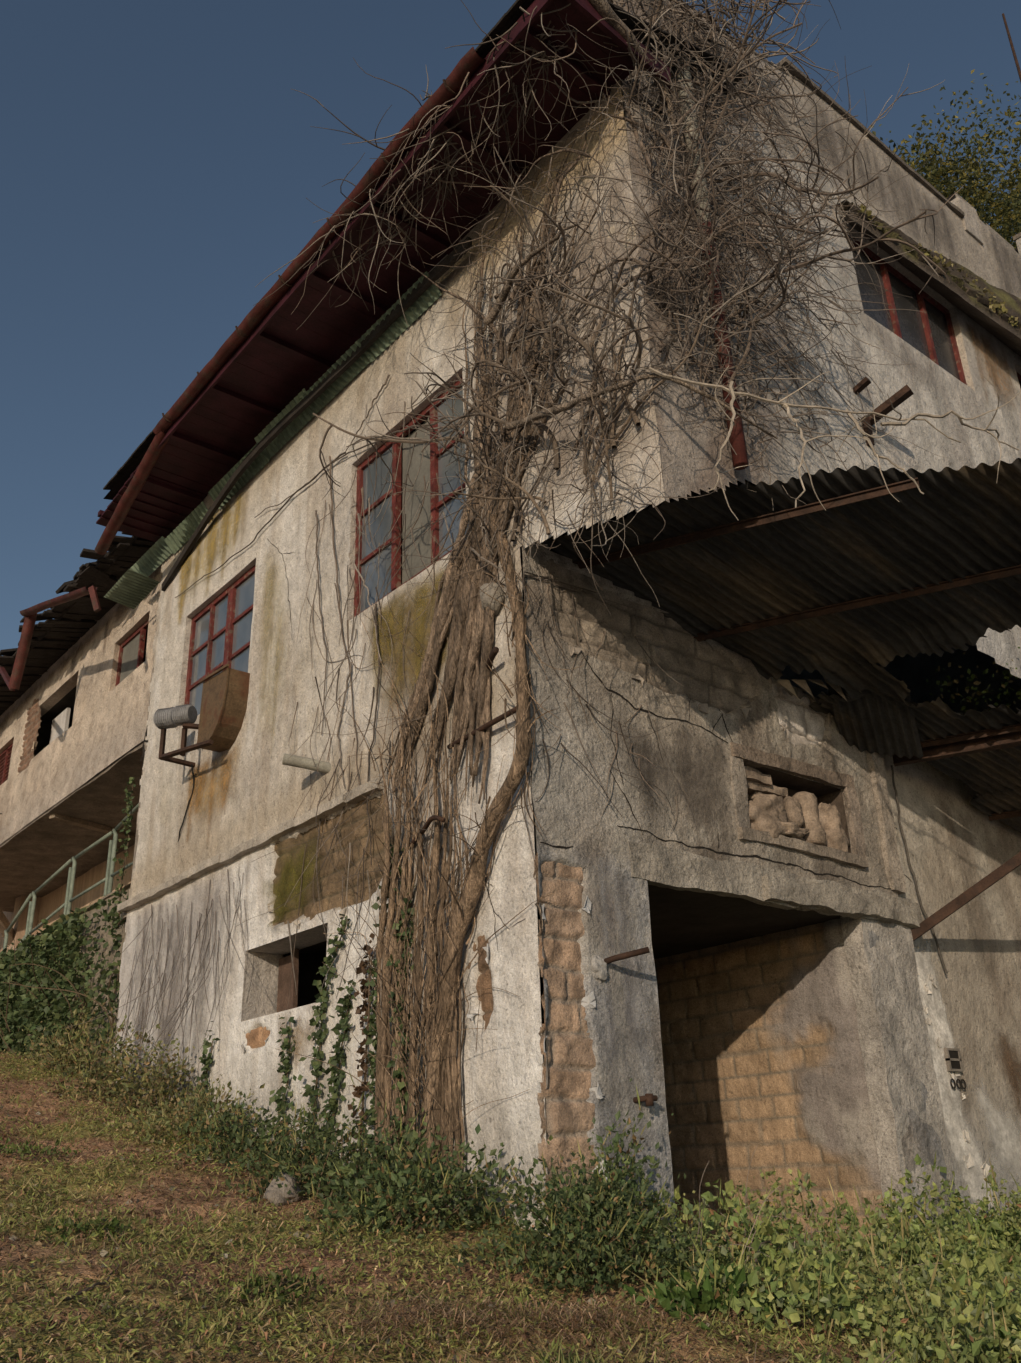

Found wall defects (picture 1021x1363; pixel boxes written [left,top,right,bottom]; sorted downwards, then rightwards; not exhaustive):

leakage [179,497,241,619]
spalling [545,559,831,747]
crack [580,651,909,889]
spalling [267,794,395,929]
spalling [241,1026,270,1053]
peeling [467,931,493,1030]
spalling [533,853,607,1225]
leakage [1002,1038,1021,1094]